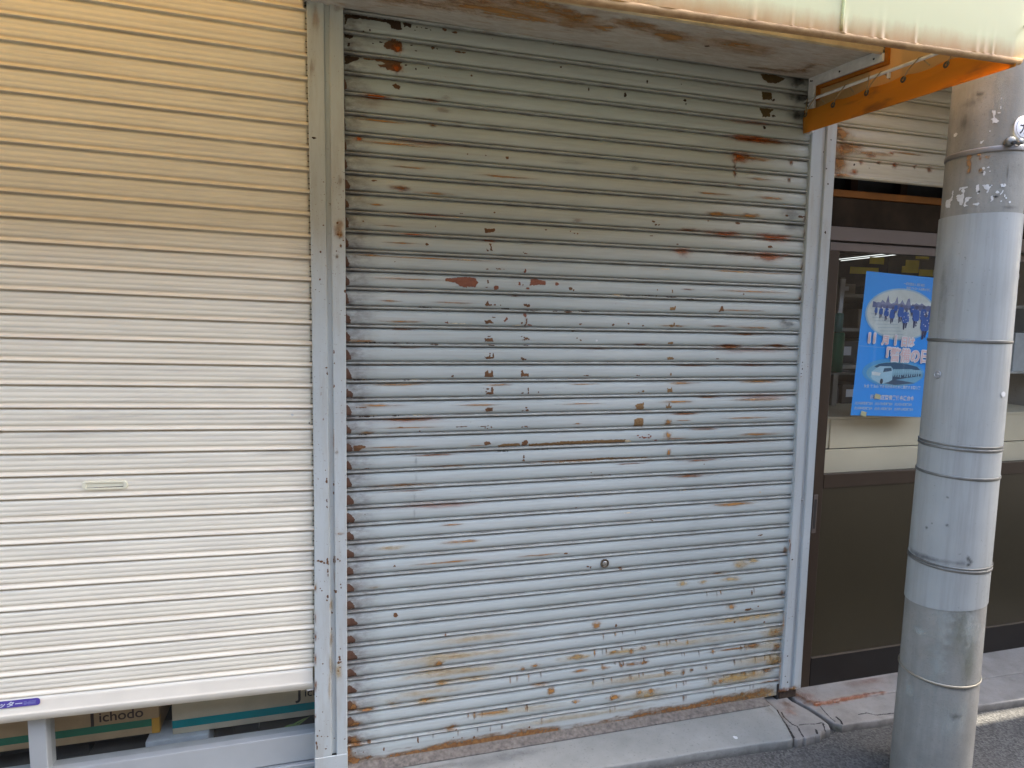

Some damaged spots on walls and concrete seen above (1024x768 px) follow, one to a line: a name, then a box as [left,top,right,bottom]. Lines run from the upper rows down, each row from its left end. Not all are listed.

rust [823,128,916,185]
rust [572,623,648,677]
rust [586,621,796,726]
rust [315,702,560,764]
crack [777,706,894,738]